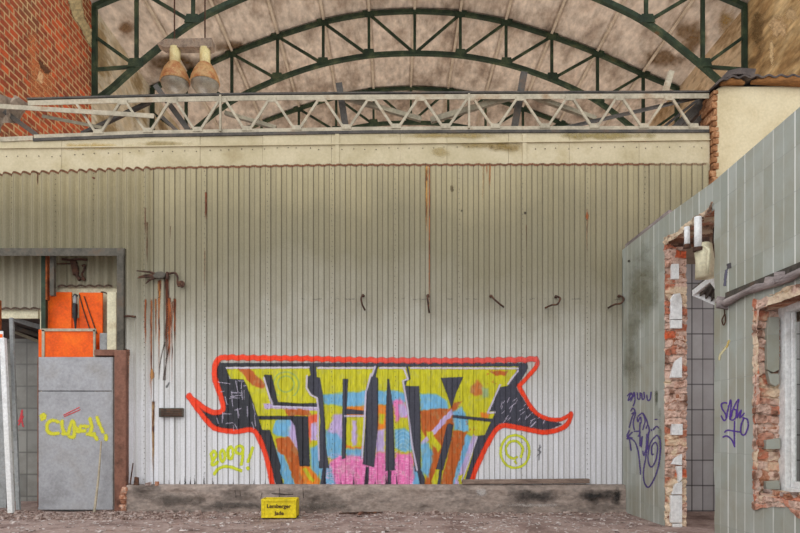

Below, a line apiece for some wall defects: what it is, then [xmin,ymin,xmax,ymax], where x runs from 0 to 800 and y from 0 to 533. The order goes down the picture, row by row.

rust [0,163,657,285]
rust [144,279,176,383]
spalling [662,201,714,527]
spalling [751,284,800,519]
damp [519,491,551,506]
damp [583,491,620,503]